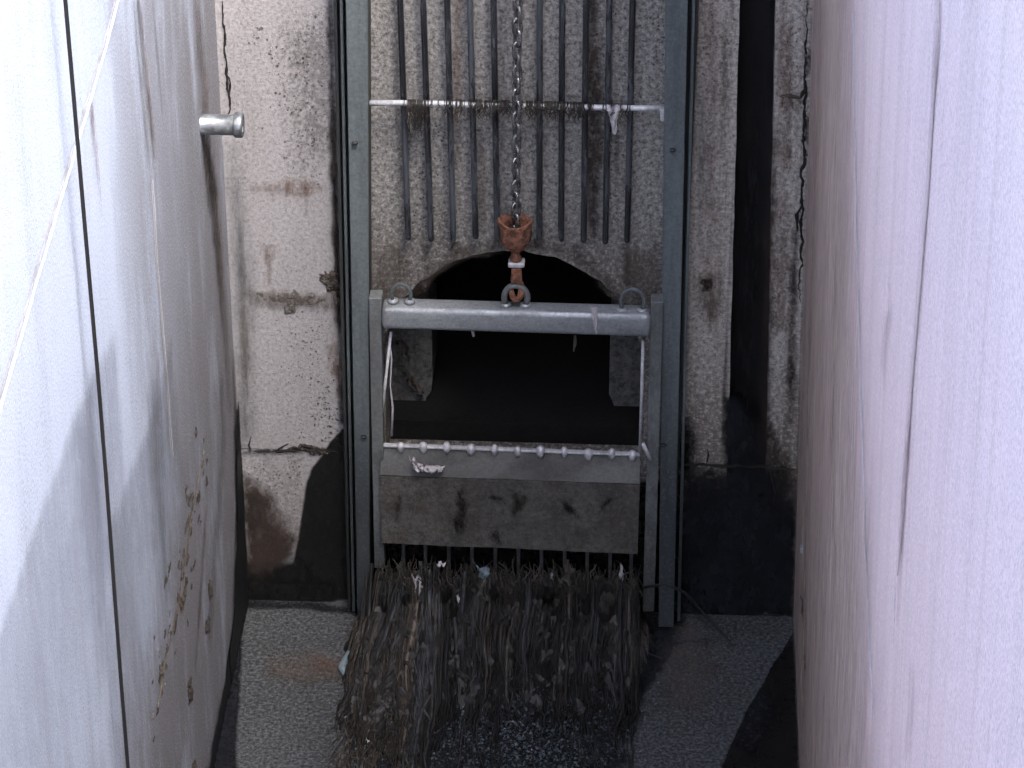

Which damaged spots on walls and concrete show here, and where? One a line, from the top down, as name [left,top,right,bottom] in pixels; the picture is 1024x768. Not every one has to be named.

crack [222,0,232,114]
water stain [209,13,358,768]
water stain [365,0,861,768]
crack [795,1,811,302]